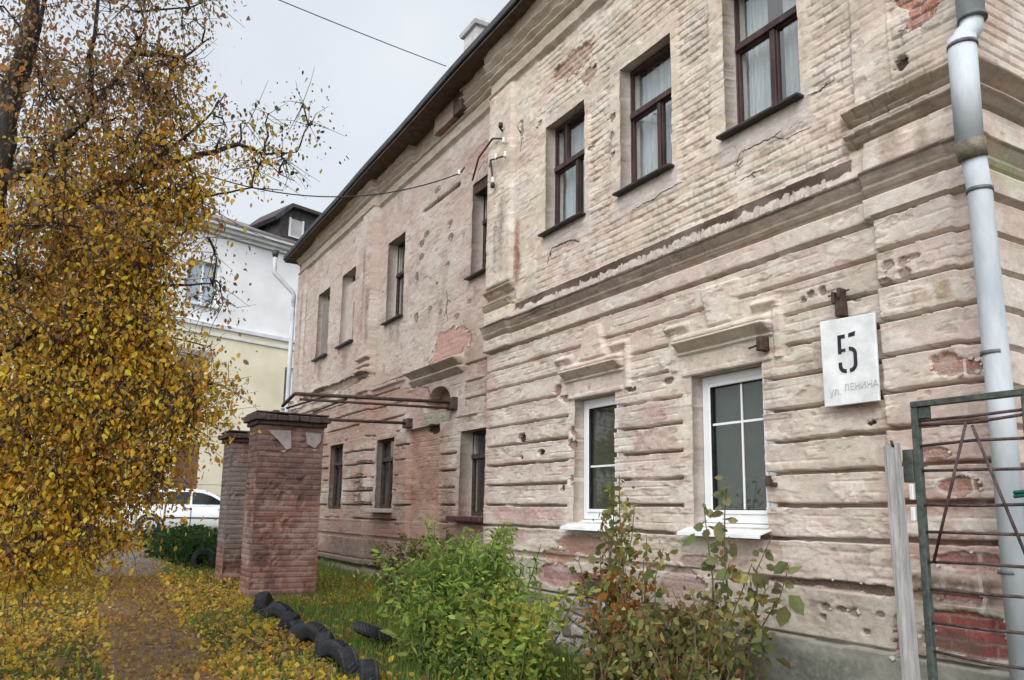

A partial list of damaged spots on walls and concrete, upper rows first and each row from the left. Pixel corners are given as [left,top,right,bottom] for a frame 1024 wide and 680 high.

flaking render [893,0,943,33]
flaking render [553,42,597,86]
spalling [893,57,909,71]
crack [735,126,812,181]
crack [547,239,579,264]
spalling [879,253,920,287]
flaking render [425,313,471,366]
flaking render [930,353,983,376]
flaking render [938,475,984,499]
flaking render [936,551,1000,570]
flaking render [915,589,1008,660]